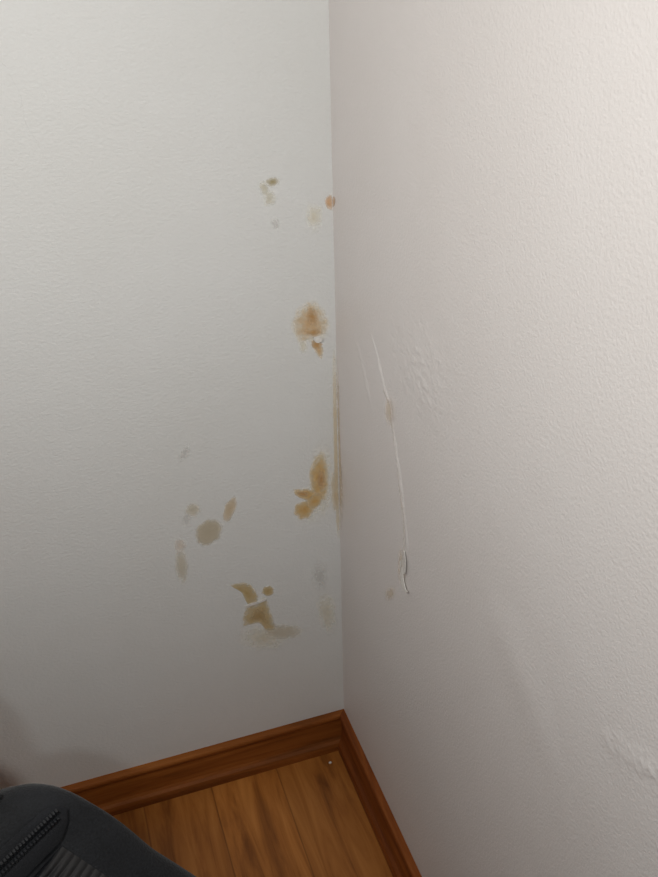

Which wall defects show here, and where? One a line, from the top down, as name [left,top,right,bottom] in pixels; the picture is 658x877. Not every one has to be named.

leakage [295,304,326,356]
leakage [295,407,339,519]
leakage [197,498,236,544]
leakage [232,584,297,637]